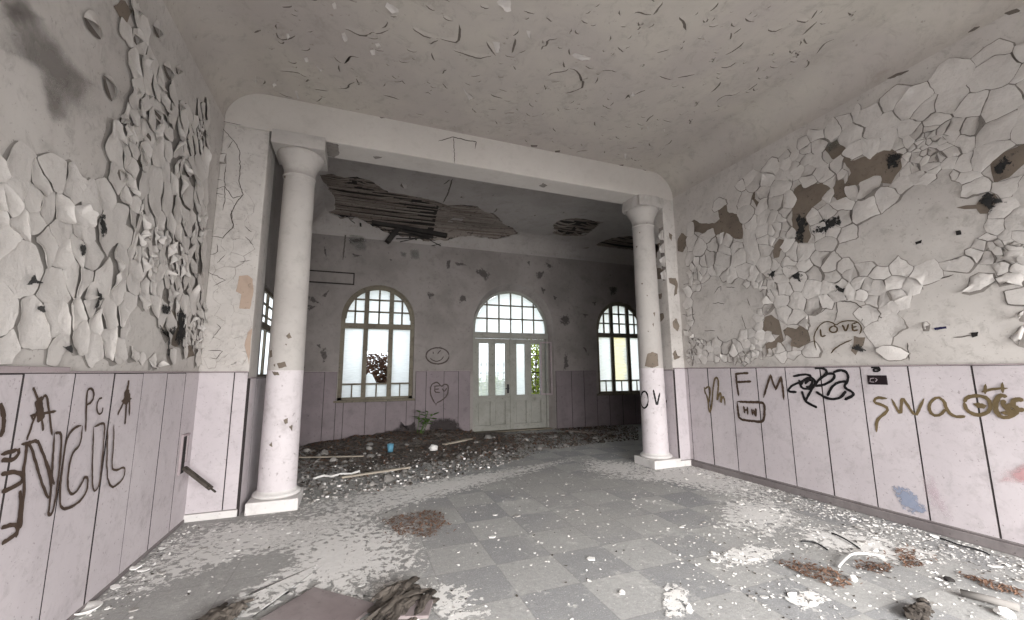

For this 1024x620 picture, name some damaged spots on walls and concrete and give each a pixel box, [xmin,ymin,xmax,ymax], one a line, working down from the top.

peeling [255,2,417,102]
peeling [413,0,663,147]
peeling [656,2,836,107]
peeling [0,0,257,370]
crack [210,121,252,286]
flaking render [326,142,339,157]
spalling [320,174,518,257]
spalling [553,218,603,236]
spalling [597,232,640,250]
flaking render [641,38,1024,368]